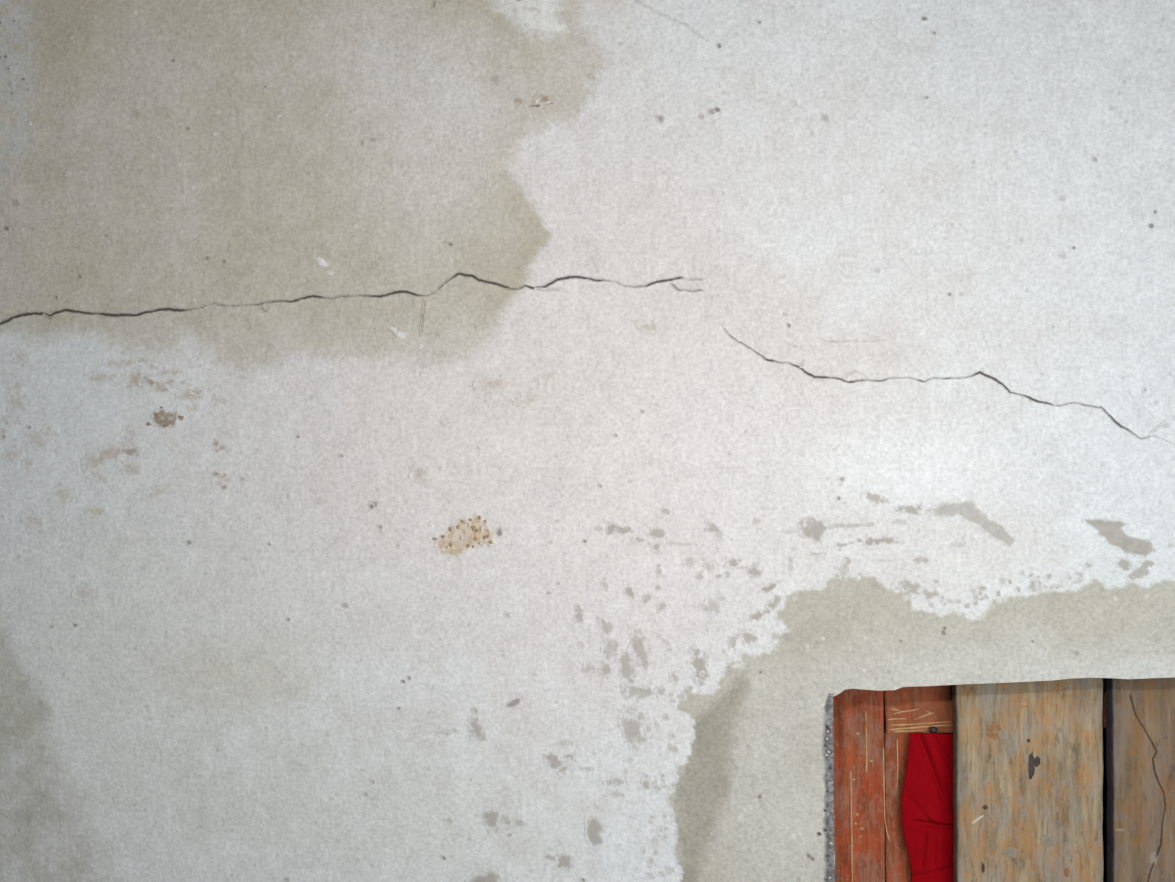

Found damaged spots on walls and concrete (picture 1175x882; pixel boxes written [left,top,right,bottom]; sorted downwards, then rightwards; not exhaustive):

water stain [0,0,614,417]
crack [0,272,707,337]
water stain [0,381,63,470]
crack [722,325,1175,446]
peeling [543,489,1175,882]